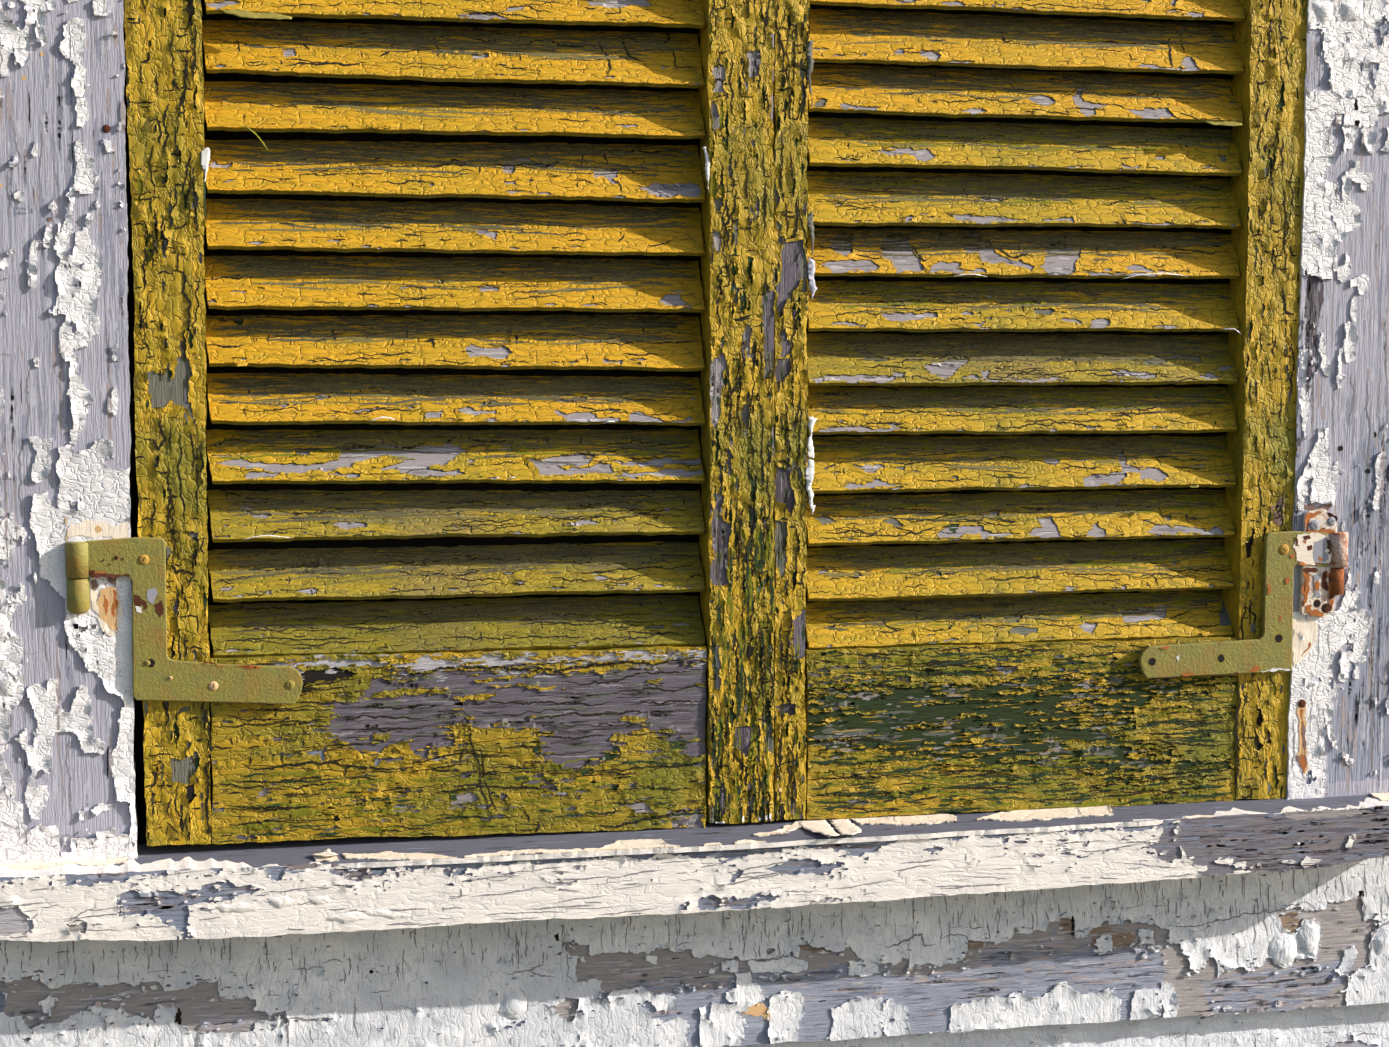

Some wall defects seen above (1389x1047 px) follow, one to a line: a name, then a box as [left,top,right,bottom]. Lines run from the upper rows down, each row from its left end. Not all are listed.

crack [0,3,43,68]
peeling [187,0,292,26]
peeling [1127,104,1178,119]
crack [7,118,43,218]
peeling [145,322,497,481]
peeling [1044,451,1168,487]
peeling [937,512,1063,540]
peeling [1141,515,1234,536]
corrosion [1267,497,1338,617]
corrosion [1296,701,1308,774]
crack [0,736,95,849]
peeling [544,895,1389,1047]